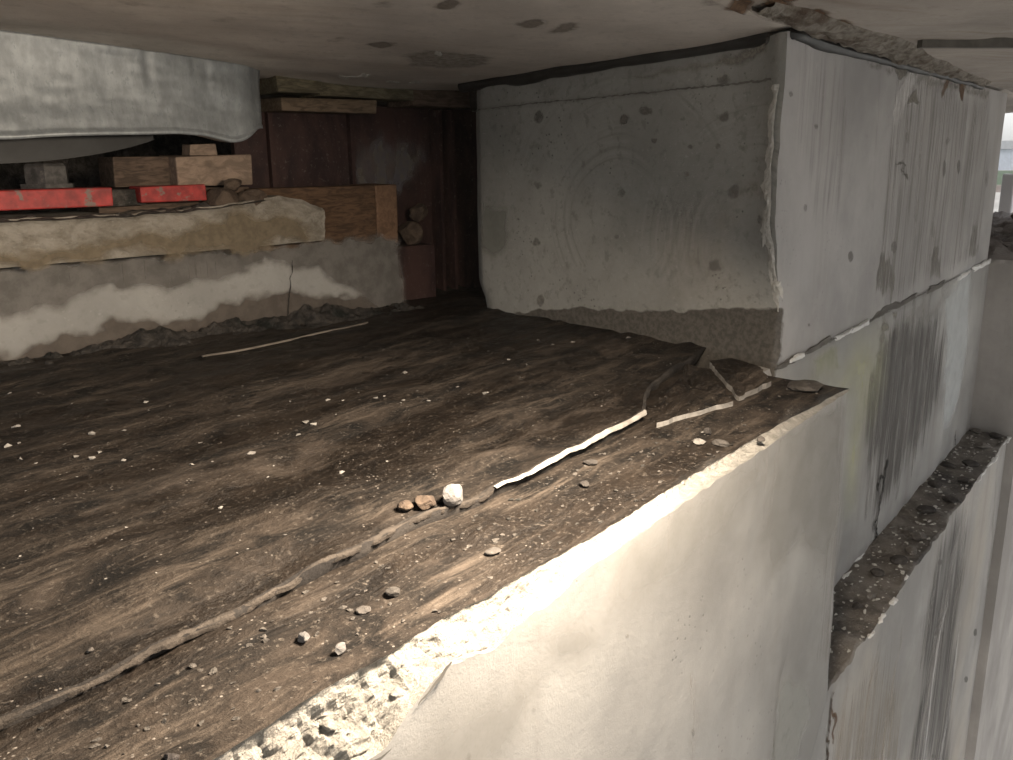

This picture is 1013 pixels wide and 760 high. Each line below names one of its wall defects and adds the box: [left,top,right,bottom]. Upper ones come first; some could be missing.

damp [0,236,404,361]
spalling [516,84,783,377]
damp [834,318,870,341]
damp [865,258,991,508]
damp [877,84,988,298]
crack [874,460,889,539]